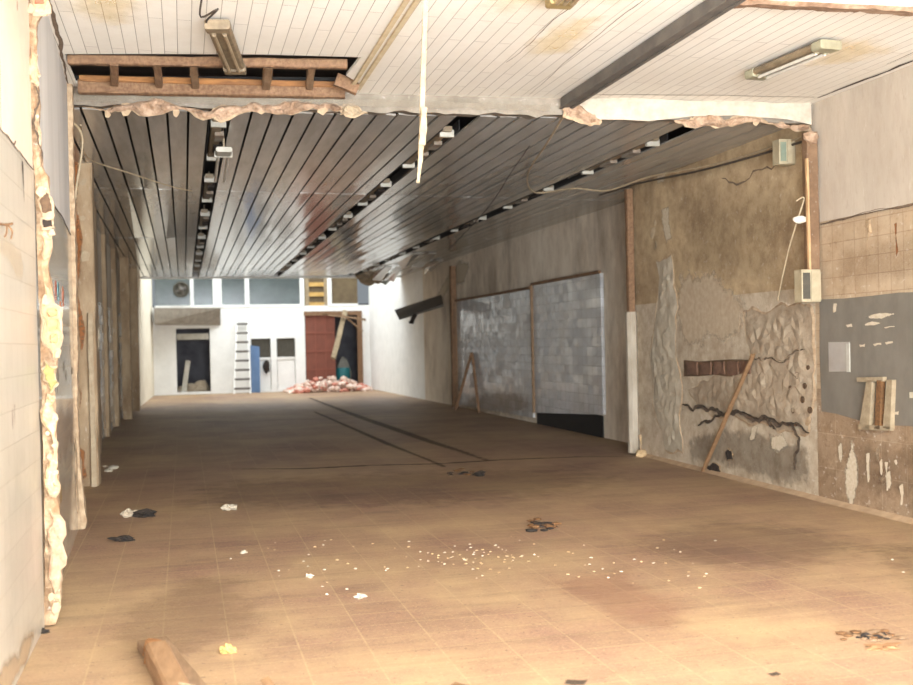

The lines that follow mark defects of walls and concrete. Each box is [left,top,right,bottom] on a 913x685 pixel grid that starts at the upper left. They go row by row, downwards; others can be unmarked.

spalling [28,0,51,17]
spalling [36,186,55,260]
spalling [40,285,63,362]
crack [754,349,804,363]
crack [682,404,809,470]
peeling [879,459,897,489]